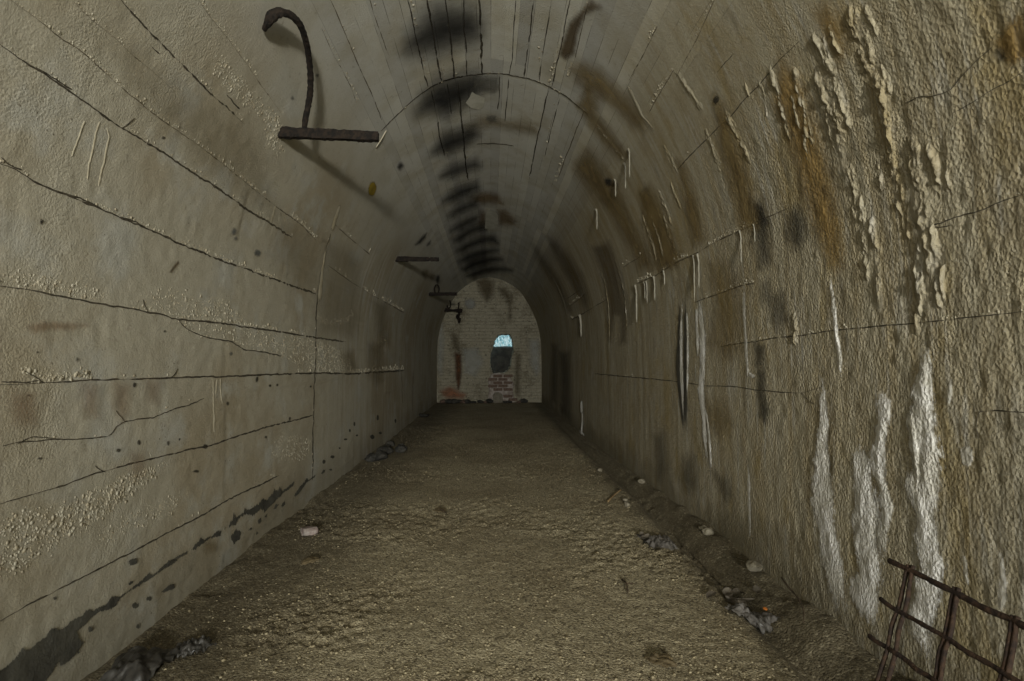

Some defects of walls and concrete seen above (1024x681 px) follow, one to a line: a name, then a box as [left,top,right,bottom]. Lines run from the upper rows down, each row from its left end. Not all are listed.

crack [0,44,293,237]
crack [0,157,317,294]
crack [408,0,570,179]
rust [779,74,838,260]
crack [0,286,404,446]
rust [443,353,464,398]
water stain [676,301,712,467]
water stain [742,298,767,421]
water stain [829,283,843,372]
crack [1,474,277,621]
water stain [811,381,894,625]
water stain [906,347,946,653]